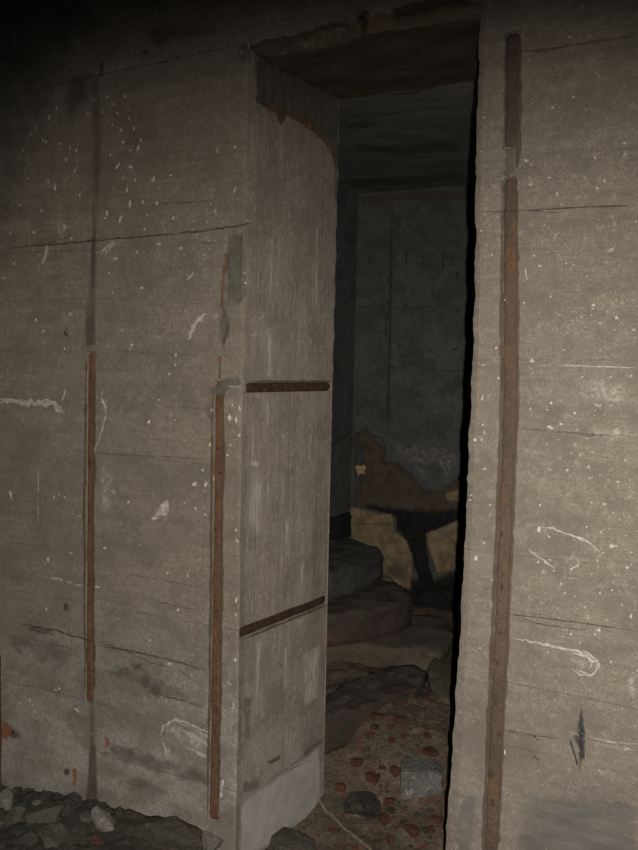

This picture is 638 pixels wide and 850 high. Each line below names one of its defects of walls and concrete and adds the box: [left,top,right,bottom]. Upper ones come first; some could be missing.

crack [12,222,250,248]
rust [246,380,332,392]
rust [482,33,522,850]
rust [83,354,97,702]
rust [207,357,225,820]
rust [239,595,327,639]
crack [20,623,207,681]